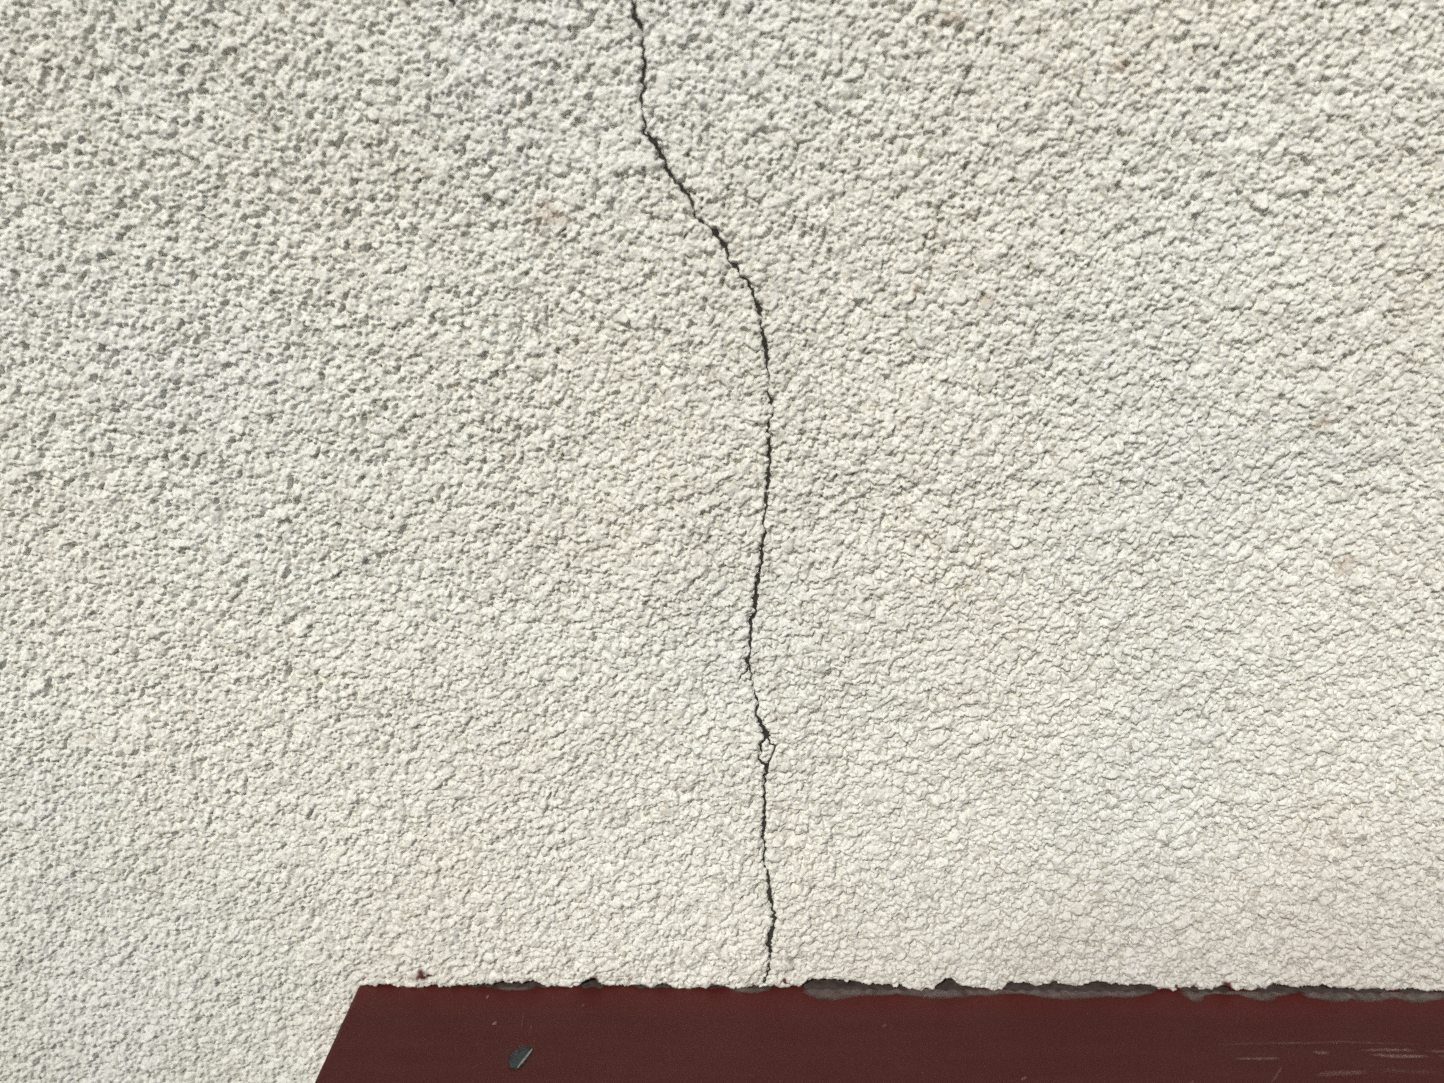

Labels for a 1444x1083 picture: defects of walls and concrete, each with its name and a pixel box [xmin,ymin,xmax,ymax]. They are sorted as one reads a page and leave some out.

crack [631,0,777,983]